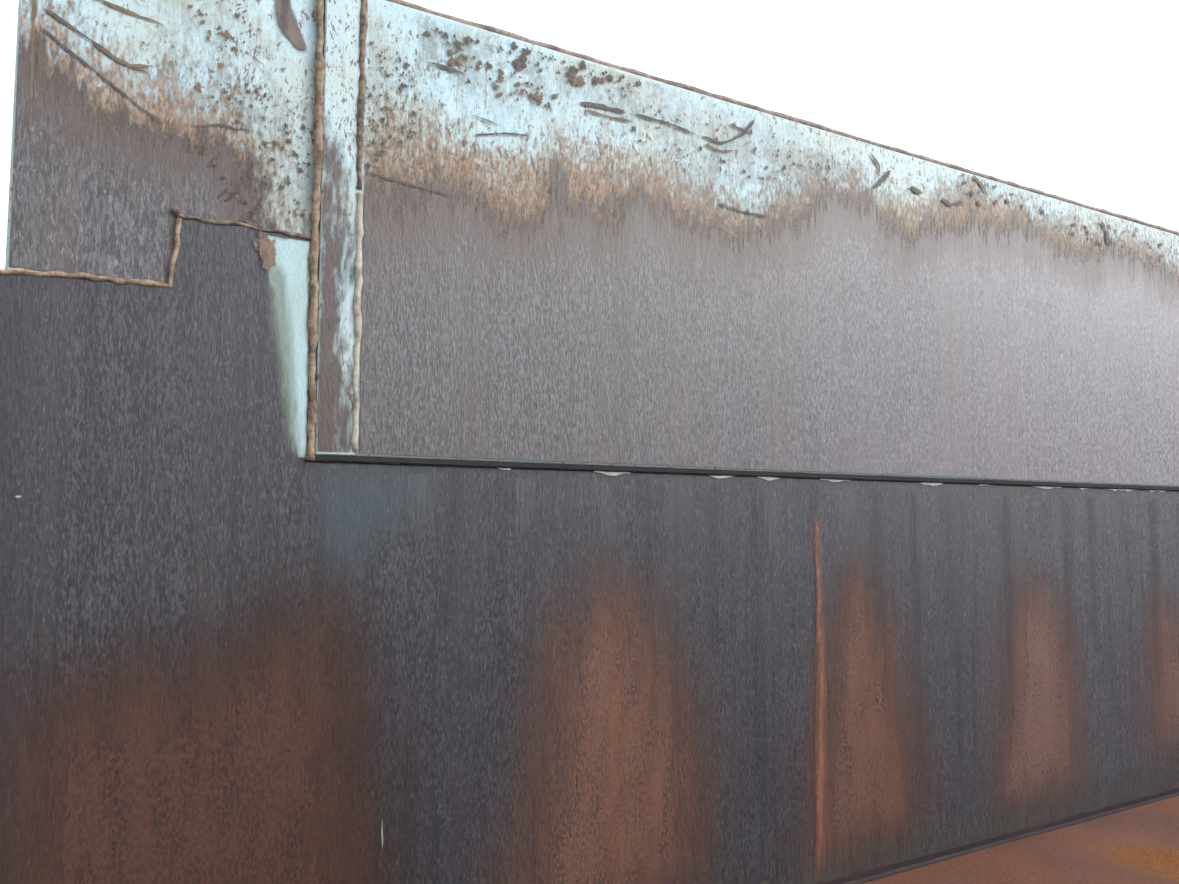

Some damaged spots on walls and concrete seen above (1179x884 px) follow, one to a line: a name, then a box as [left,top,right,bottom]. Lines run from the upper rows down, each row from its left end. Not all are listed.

corrosion [9,0,297,284]
peeling [188,0,260,56]
peeling [194,82,311,217]
peeling [276,0,307,50]
peeling [365,41,418,167]
peeling [423,27,642,111]
peeling [664,115,840,181]
corrosion [317,110,1179,486]
corrosion [535,596,699,884]
corrosion [814,523,910,879]
corrosion [1005,592,1074,809]